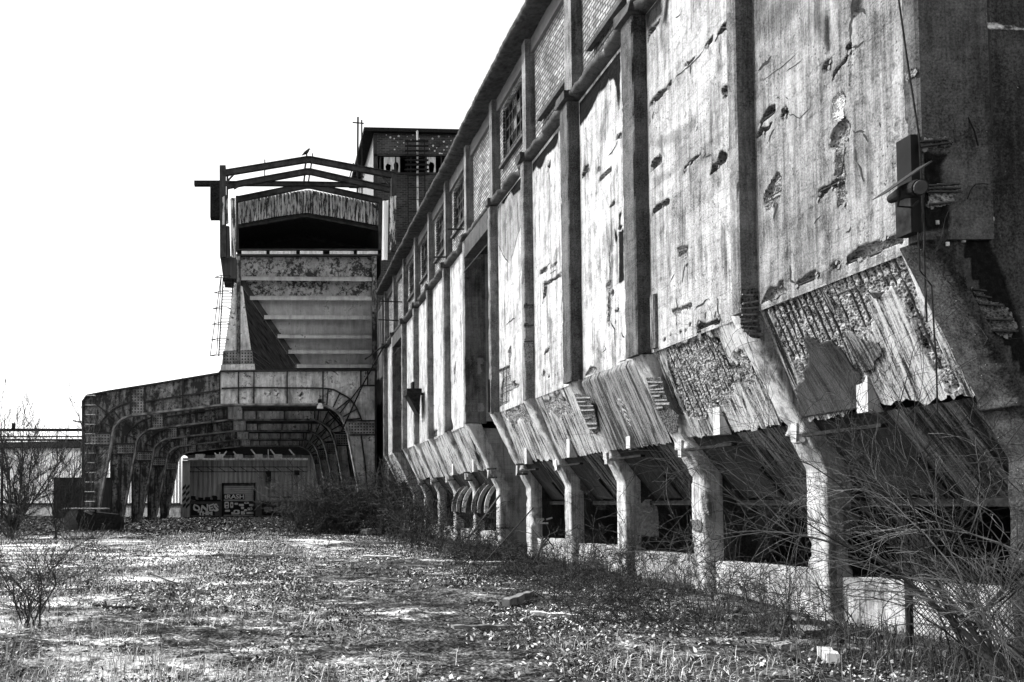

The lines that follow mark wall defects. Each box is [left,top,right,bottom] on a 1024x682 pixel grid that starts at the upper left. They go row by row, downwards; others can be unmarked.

spalling [757,104,789,138]
spalling [709,150,729,175]
spalling [829,102,851,210]
spalling [652,199,670,215]
spalling [763,172,782,211]
spalling [760,235,963,394]
spalling [664,316,755,420]